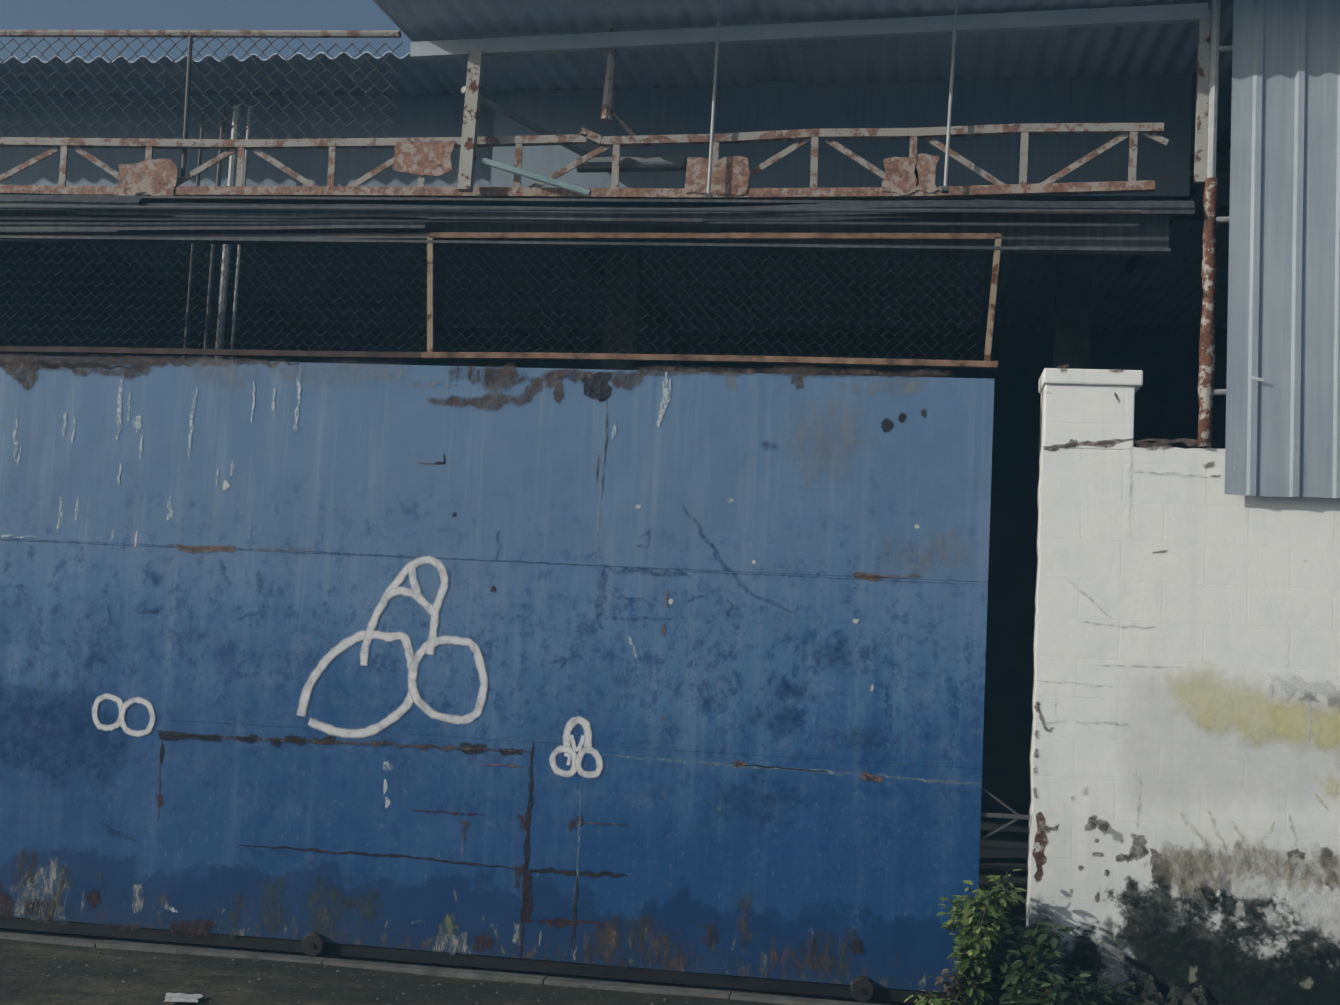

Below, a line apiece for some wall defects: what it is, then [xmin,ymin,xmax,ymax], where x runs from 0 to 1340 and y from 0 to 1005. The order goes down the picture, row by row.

crack [1043,438,1134,451]
corrosion [478,741,629,960]
peeling [1078,815,1172,902]
water stain [1024,842,1340,1005]